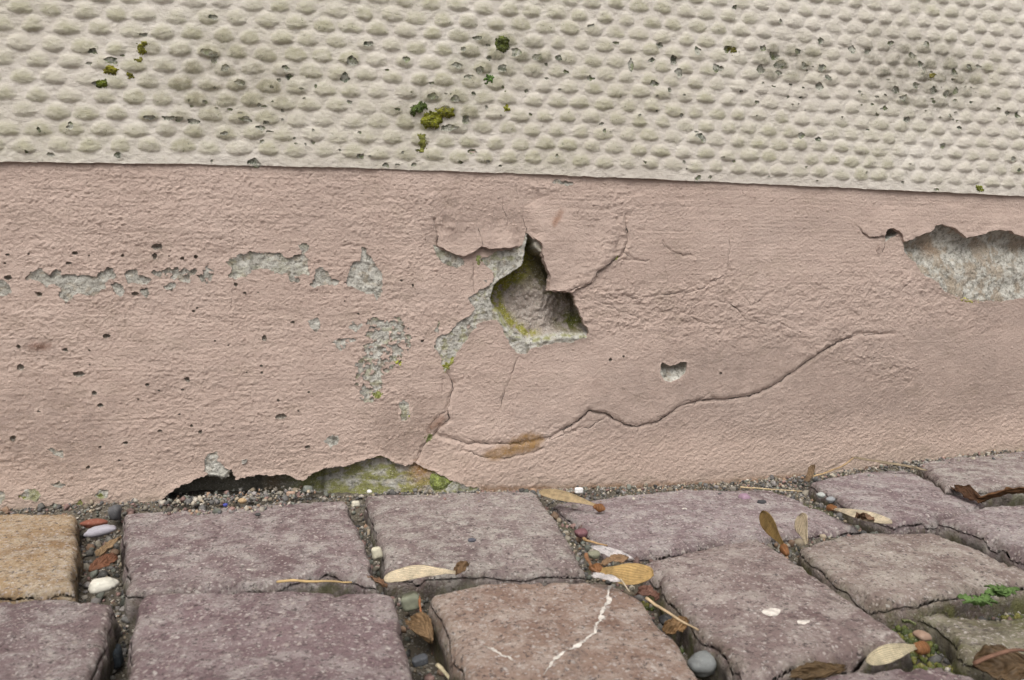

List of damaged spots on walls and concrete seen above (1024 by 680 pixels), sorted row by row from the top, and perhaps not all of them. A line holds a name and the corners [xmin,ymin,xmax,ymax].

peeling [25,243,214,304]
peeling [226,243,383,300]
spalling [876,225,1024,302]
spalling [332,233,587,403]
crack [418,333,882,459]
hole [660,362,686,382]
spalling [171,451,479,494]